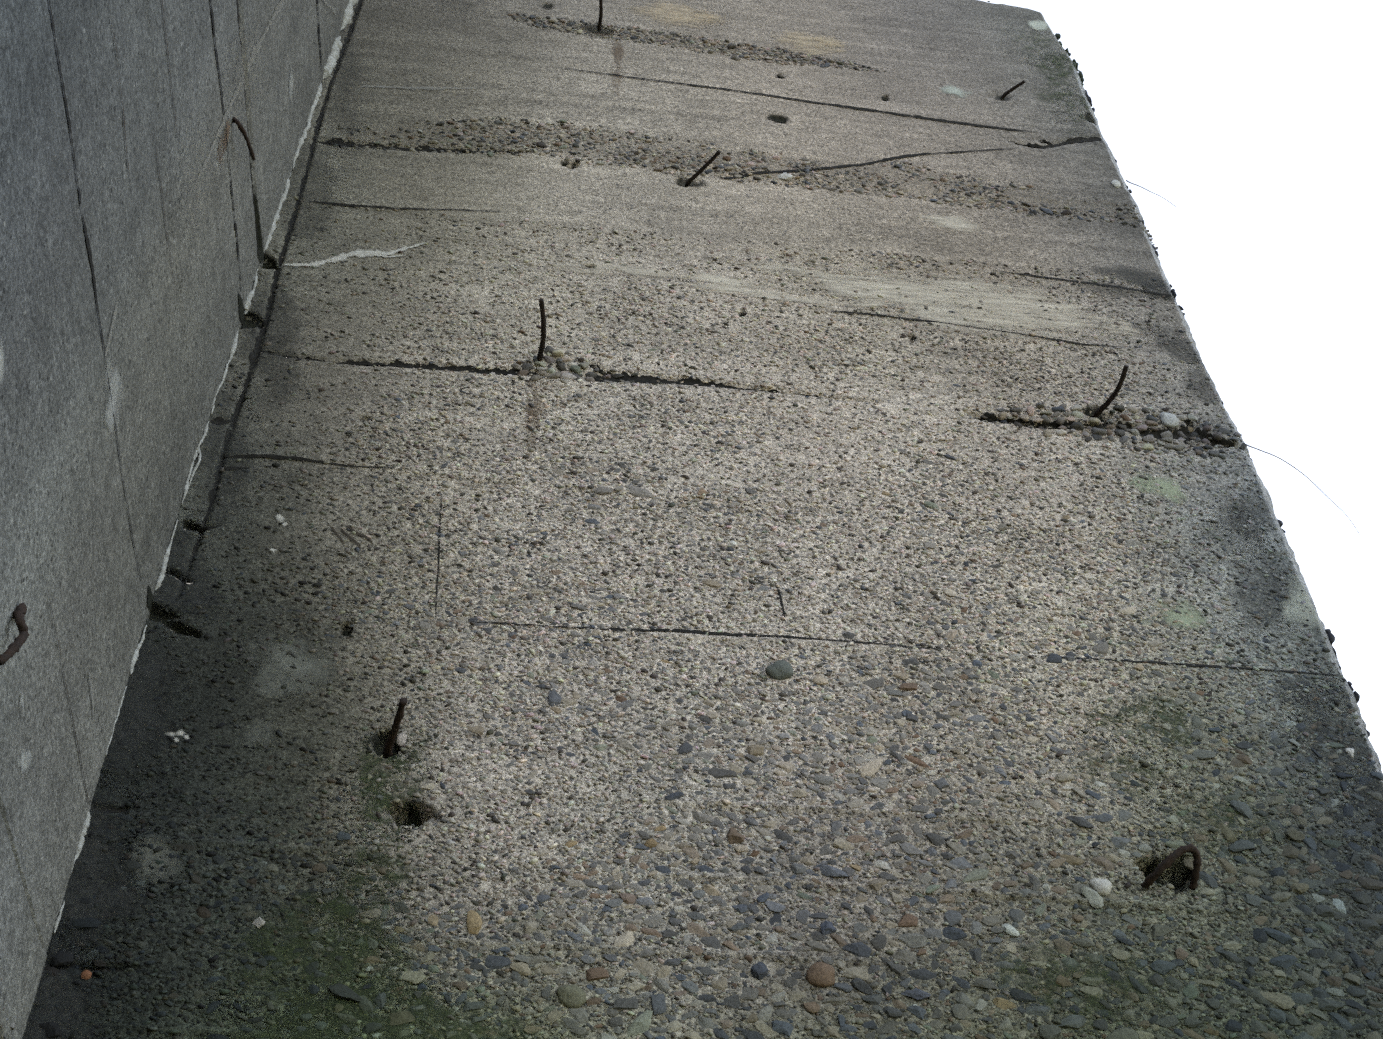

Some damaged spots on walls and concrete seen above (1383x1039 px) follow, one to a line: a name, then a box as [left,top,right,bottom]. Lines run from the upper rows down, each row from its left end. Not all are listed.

leakage [264,0,358,253]
crack [555,66,1103,179]
leakage [244,269,261,325]
crack [589,364,819,397]
leakage [153,331,244,604]
spalling [24,196,1383,1039]
leakage [1274,586,1317,622]
leakage [105,625,159,756]
leakage [54,811,132,933]